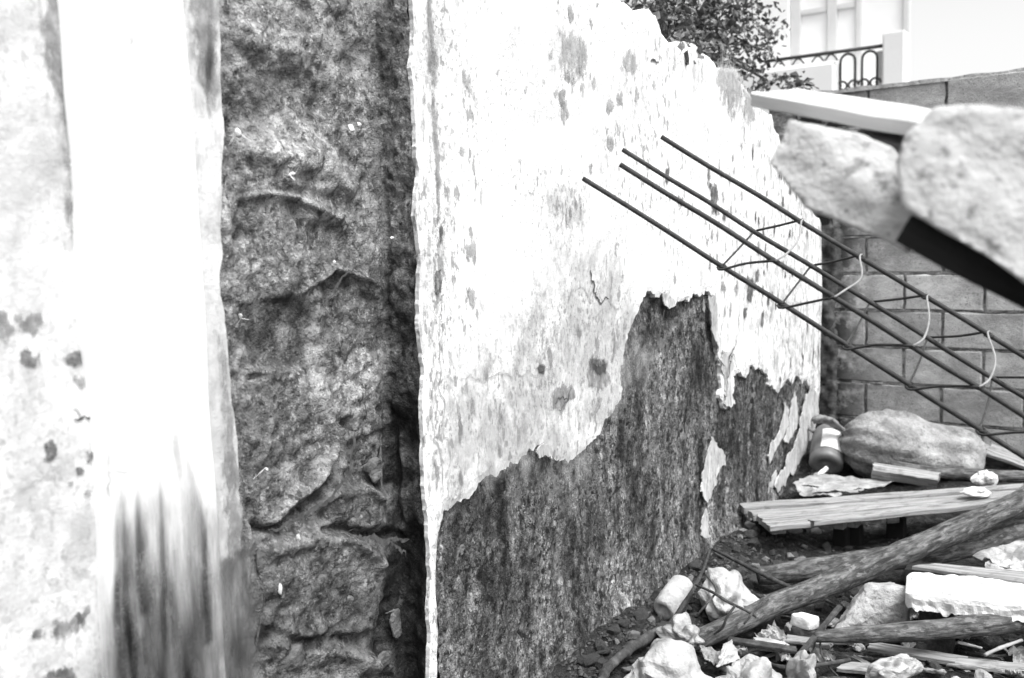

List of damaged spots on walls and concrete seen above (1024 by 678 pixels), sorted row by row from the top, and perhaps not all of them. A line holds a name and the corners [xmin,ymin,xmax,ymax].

peeling [423,0,443,244]
flaking render [435,143,819,678]